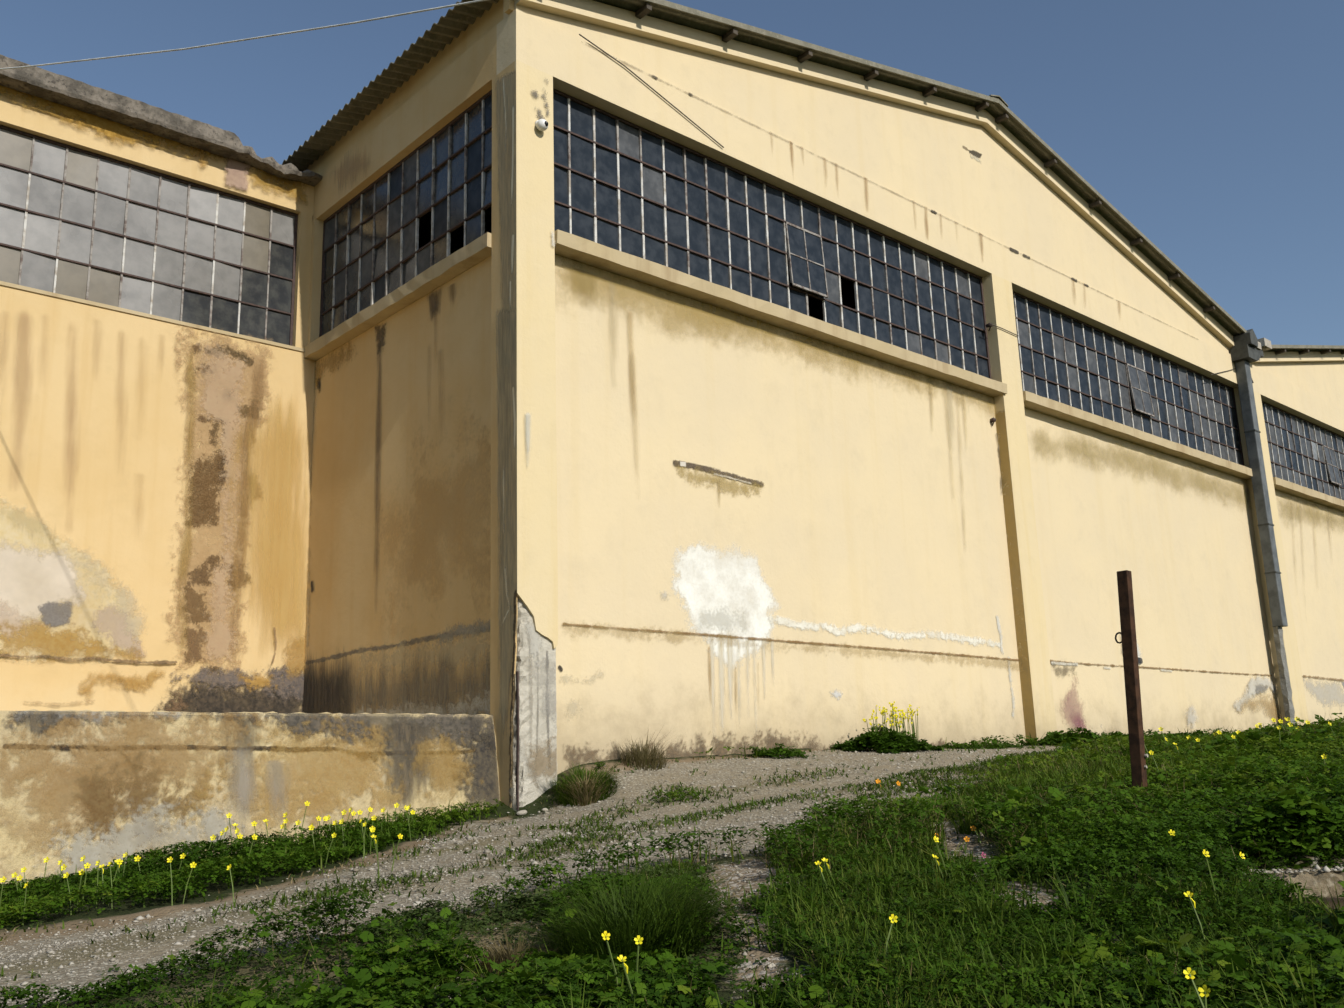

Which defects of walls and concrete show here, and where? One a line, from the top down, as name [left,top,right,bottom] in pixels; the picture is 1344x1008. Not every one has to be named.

peeling [0,499,143,662]
leakage [8,326,500,807]